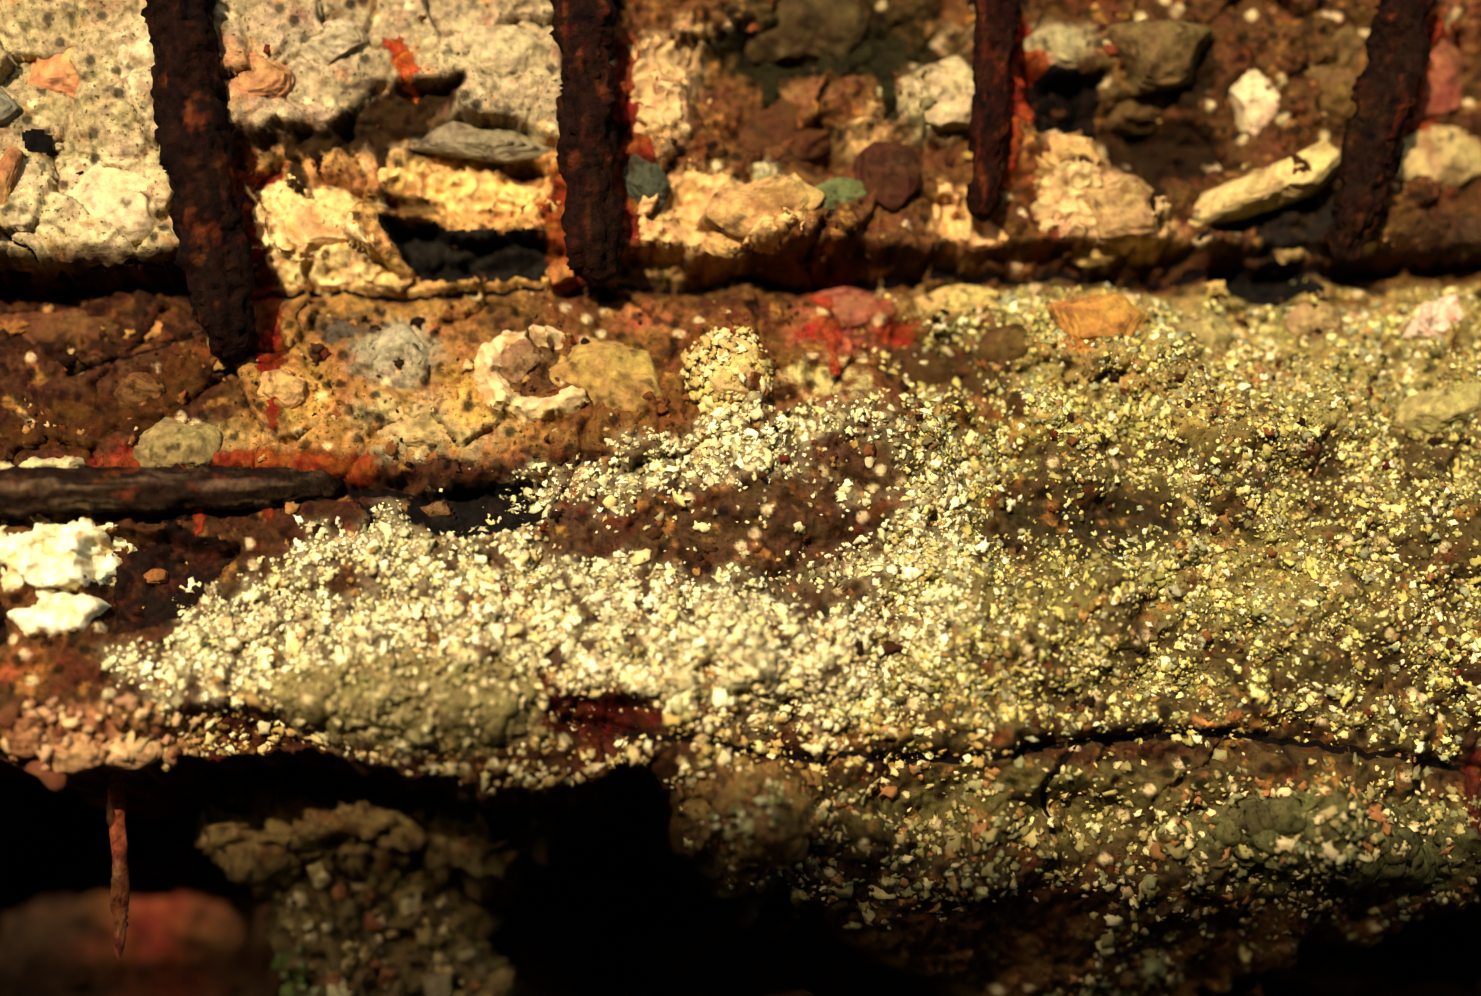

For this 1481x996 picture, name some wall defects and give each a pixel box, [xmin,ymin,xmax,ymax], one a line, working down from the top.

rust [611,33,656,253]
rust [1001,15,1048,192]
spalling [372,213,576,293]
rust [537,160,584,297]
spalling [0,264,202,359]
spalling [473,324,590,423]
water stain [0,455,85,470]
rust [193,508,205,534]
rust [210,396,378,486]
spalling [406,479,544,538]
water stain [0,513,137,638]
spalling [113,523,238,633]